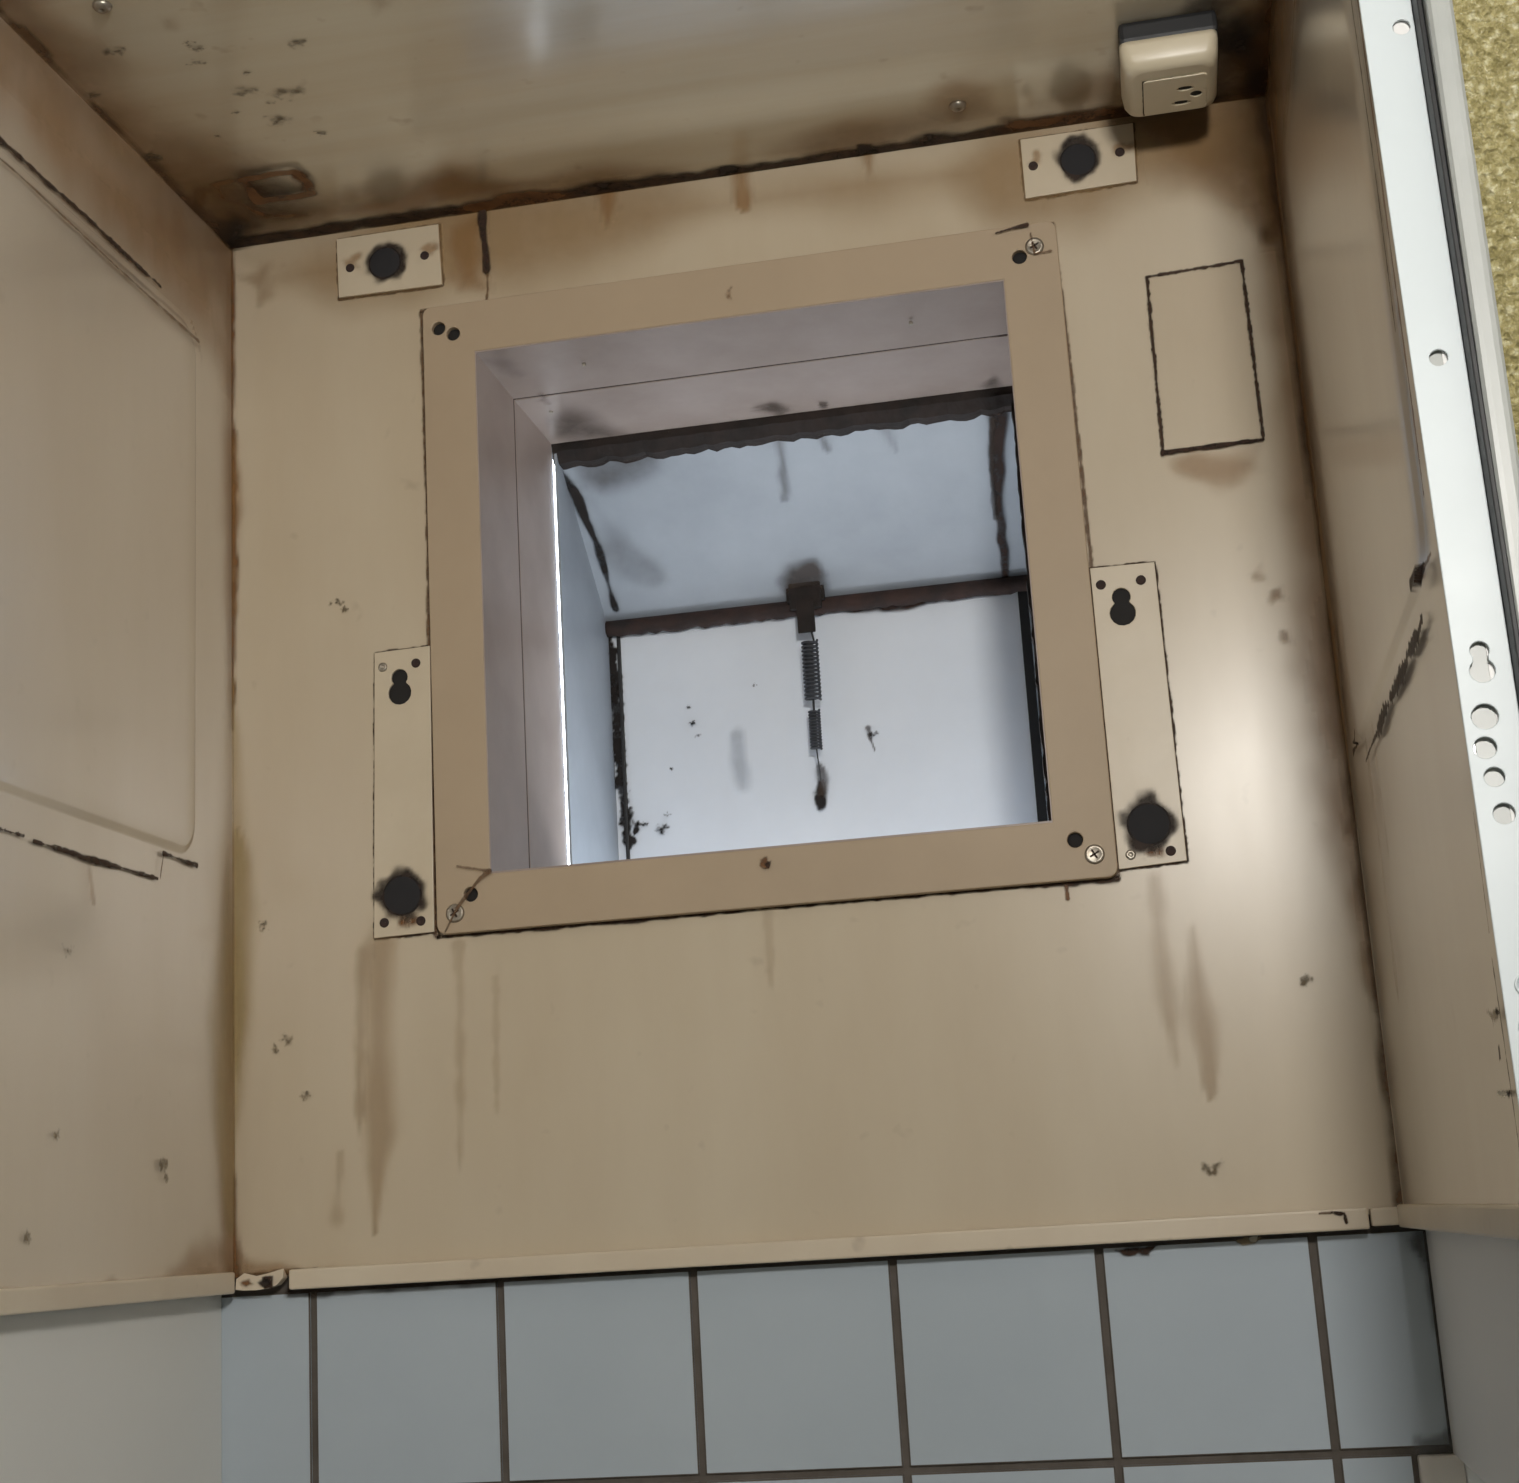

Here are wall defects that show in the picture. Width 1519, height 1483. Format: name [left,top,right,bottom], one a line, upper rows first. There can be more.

rust [193,107,1131,730]
rust [233,1177,289,1281]